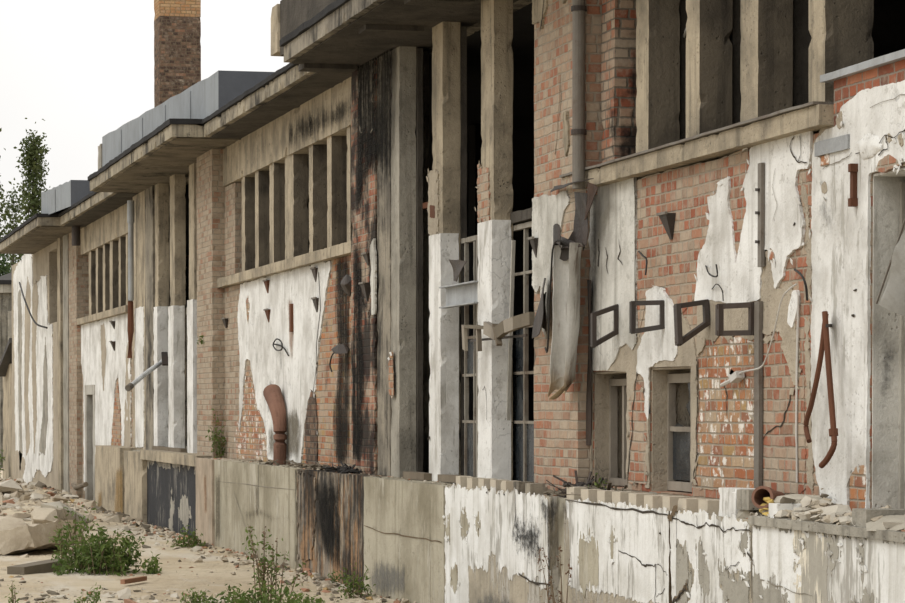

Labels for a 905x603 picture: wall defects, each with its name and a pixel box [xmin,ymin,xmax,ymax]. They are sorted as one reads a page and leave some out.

spalling [475,162,491,223]
spalling [637,148,750,328]
spalling [790,154,830,343]
spalling [234,371,268,462]
crack [627,372,637,478]
crack [691,359,699,483]
crack [763,399,790,439]
peeling [442,507,481,545]
crack [518,525,550,597]
peeling [577,527,616,598]
crack [565,499,812,603]
peeling [670,536,789,603]